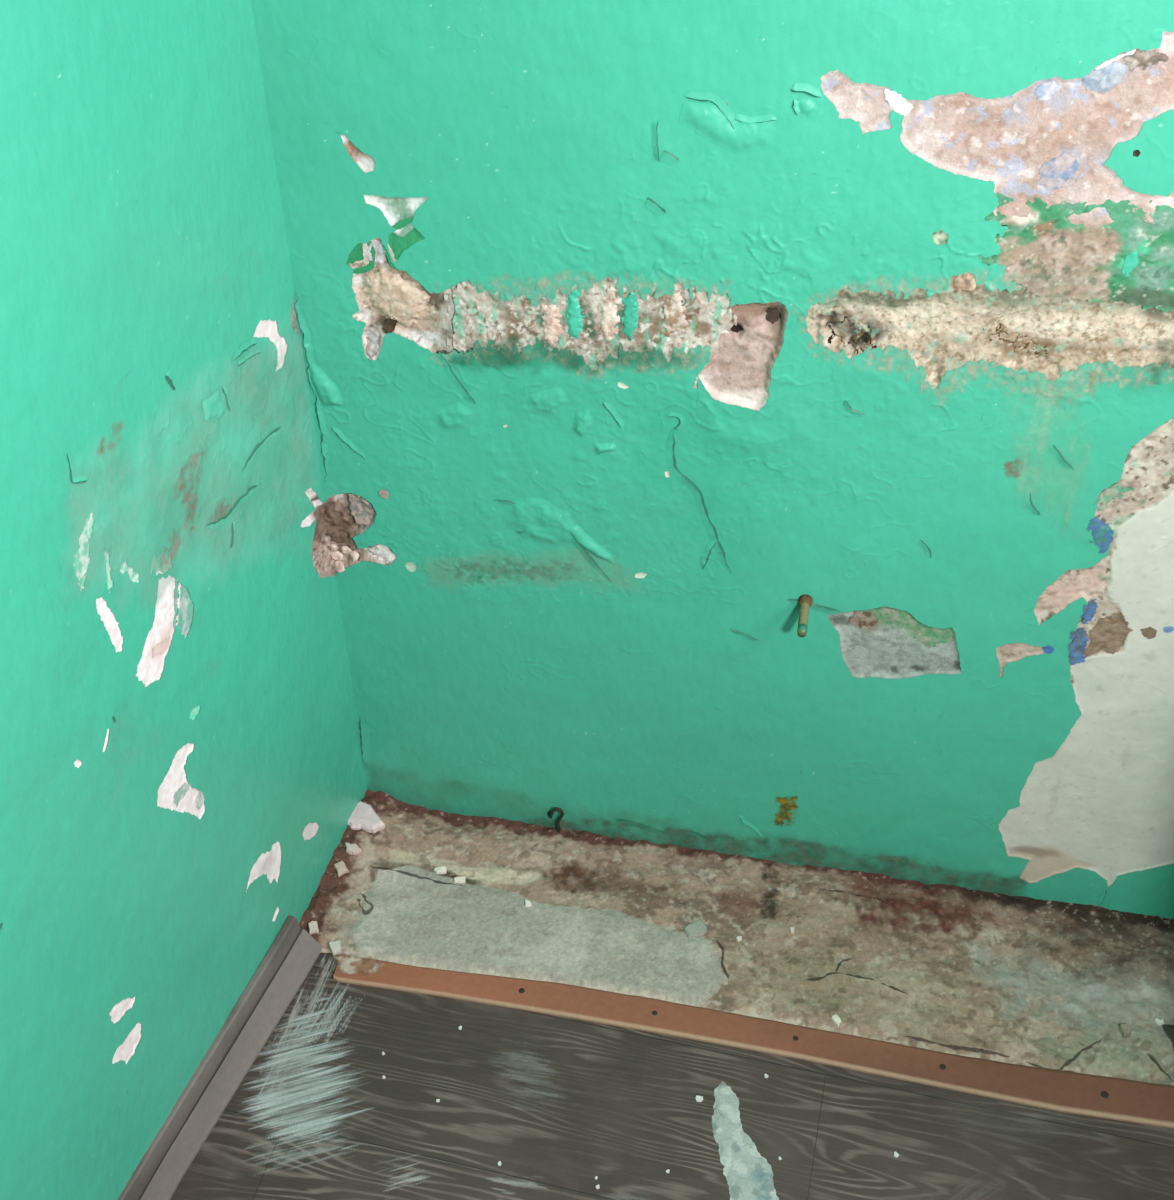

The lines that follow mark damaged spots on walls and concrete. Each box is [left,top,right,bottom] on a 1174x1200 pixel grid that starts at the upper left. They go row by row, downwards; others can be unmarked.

peeling [340,134,376,173]
peeling [346,31,1174,412]
peeling [73,512,194,688]
spalling [299,417,1174,1085]
peeling [157,743,205,819]
rust [775,797,797,825]
peeling [246,841,282,893]
leakage [762,841,820,918]
peeling [109,996,136,1024]
leakage [1045,981,1168,1032]
peeling [112,1022,142,1064]
leakage [390,1164,425,1190]